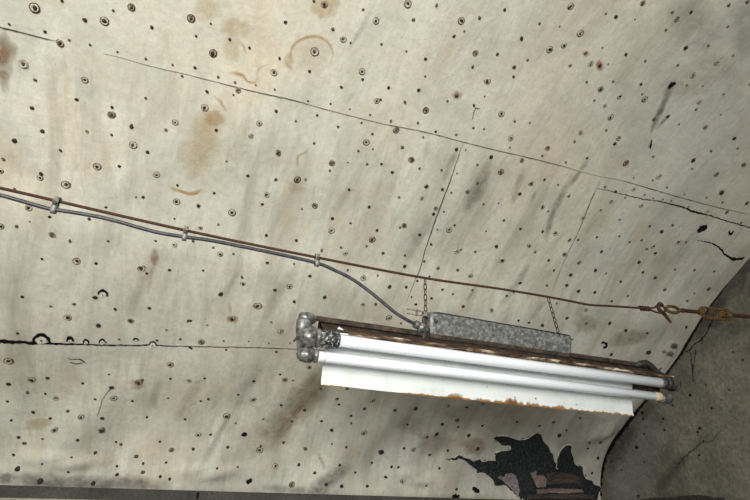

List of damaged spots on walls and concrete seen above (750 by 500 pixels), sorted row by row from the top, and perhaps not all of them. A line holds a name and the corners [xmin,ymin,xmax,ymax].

crack [598,188,750,228]
crack [697,240,745,261]
peeling [447,432,602,500]